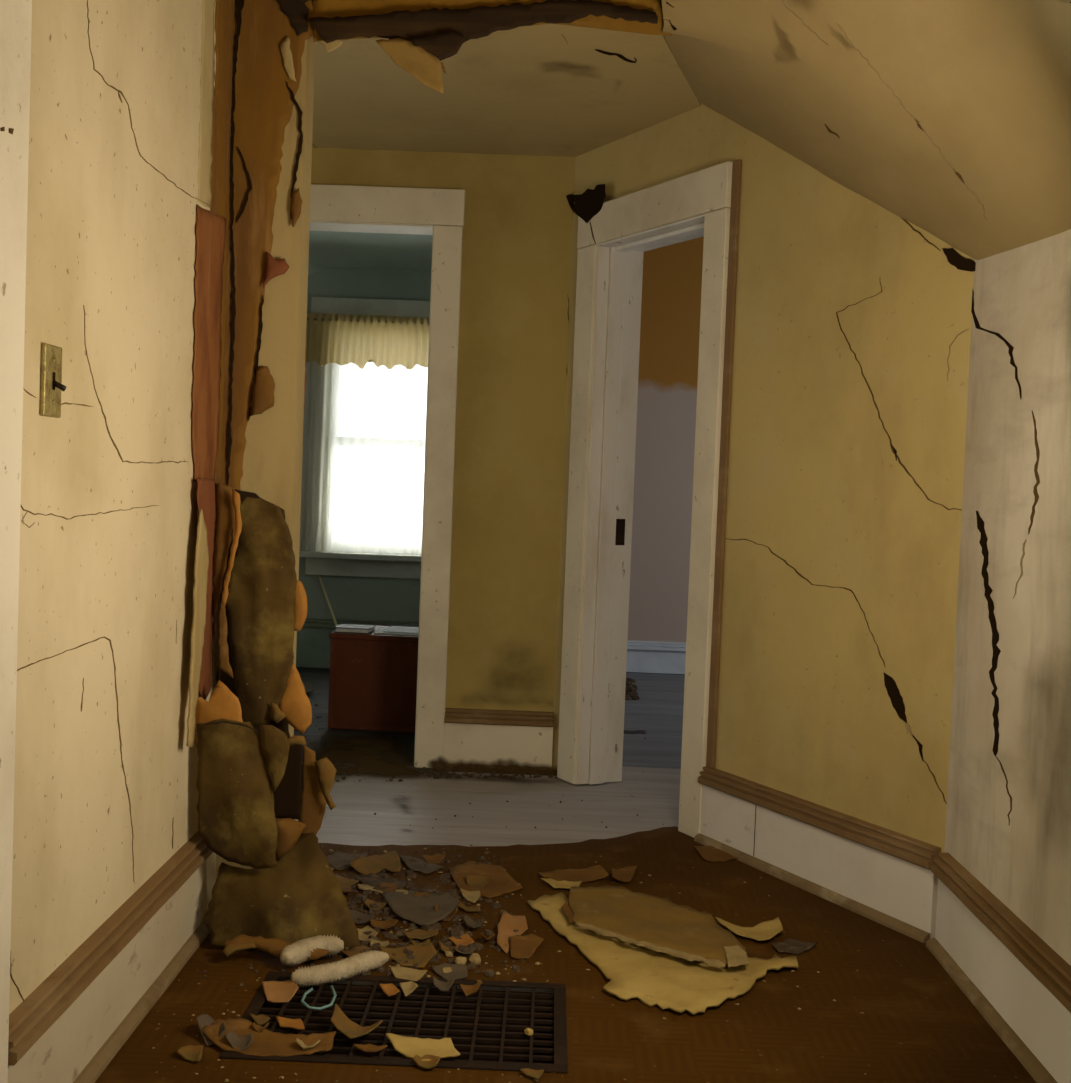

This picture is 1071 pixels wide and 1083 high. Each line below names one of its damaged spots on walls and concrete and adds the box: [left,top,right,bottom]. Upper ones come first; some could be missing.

crack [87,0,211,207]
spalling [276,0,309,81]
crack [781,0,987,220]
peeling [263,251,290,288]
peeling [290,188,302,227]
crack [61,305,187,464]
peeling [250,366,275,416]
crack [21,505,159,528]
crack [726,538,885,666]
crack [836,282,1040,826]
crack [17,636,134,882]
hole [269,745,303,820]